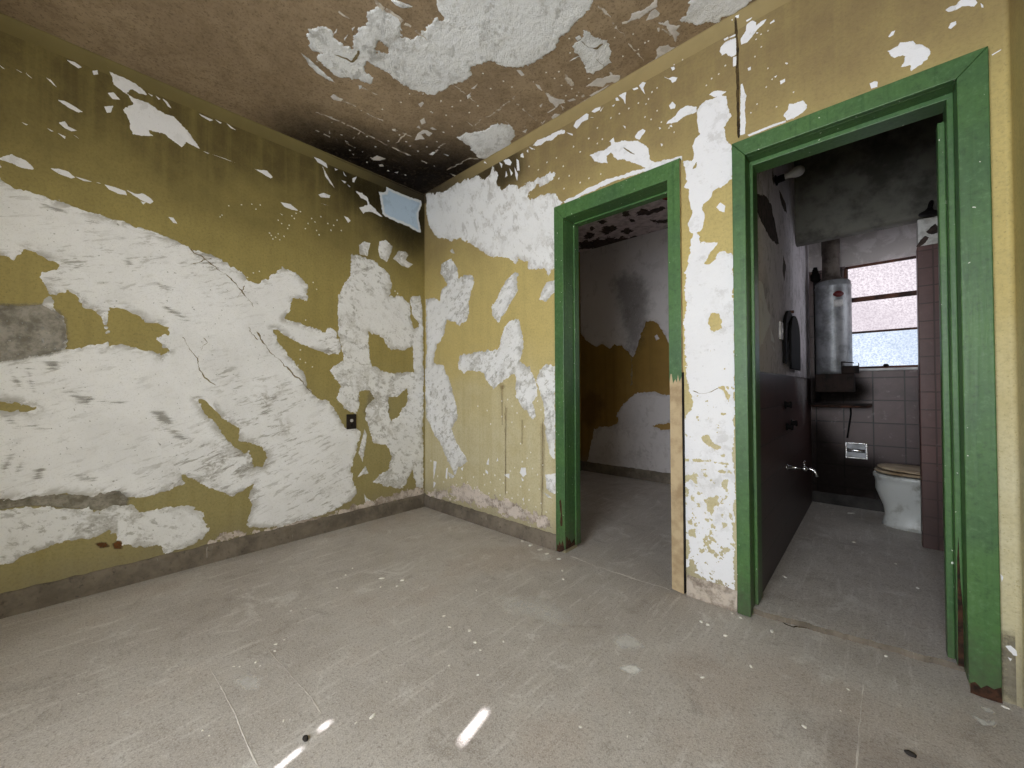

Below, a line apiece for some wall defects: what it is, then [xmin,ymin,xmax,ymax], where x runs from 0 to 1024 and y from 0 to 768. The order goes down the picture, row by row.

peeling [627,0,680,63]
peeling [720,15,775,71]
peeling [888,31,931,71]
peeling [946,0,984,29]
peeling [67,60,230,161]
peeling [484,72,645,179]
peeling [51,168,153,204]
peeling [314,157,422,233]
peeling [359,240,413,268]
crack [251,332,312,392]
peeling [564,84,807,590]
flaking render [208,461,563,544]